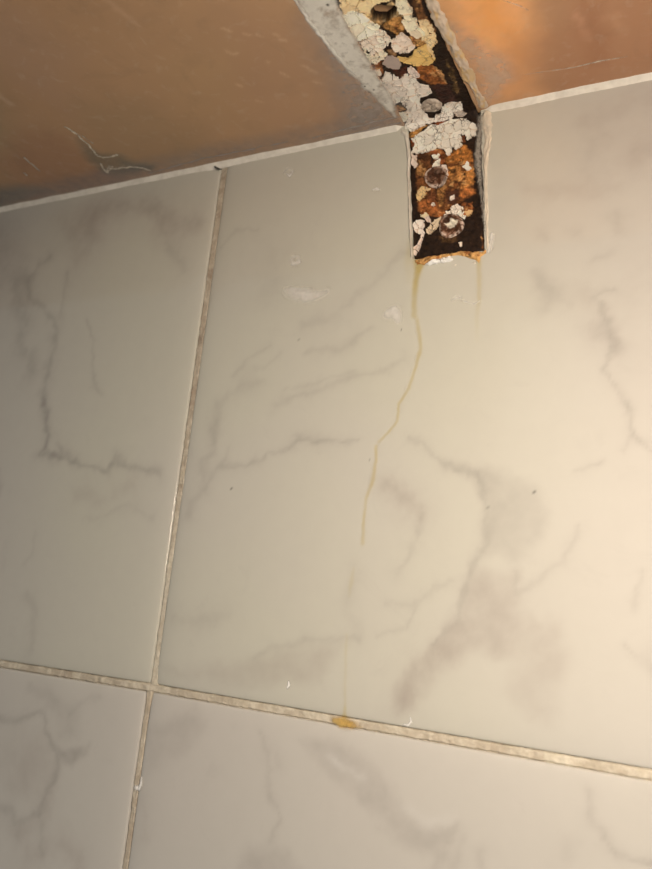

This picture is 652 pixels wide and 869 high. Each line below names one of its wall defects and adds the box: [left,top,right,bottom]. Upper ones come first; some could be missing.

peeling [326,0,478,176]
peeling [413,186,473,256]
corrosion [414,249,486,266]
corrosion [332,717,356,728]